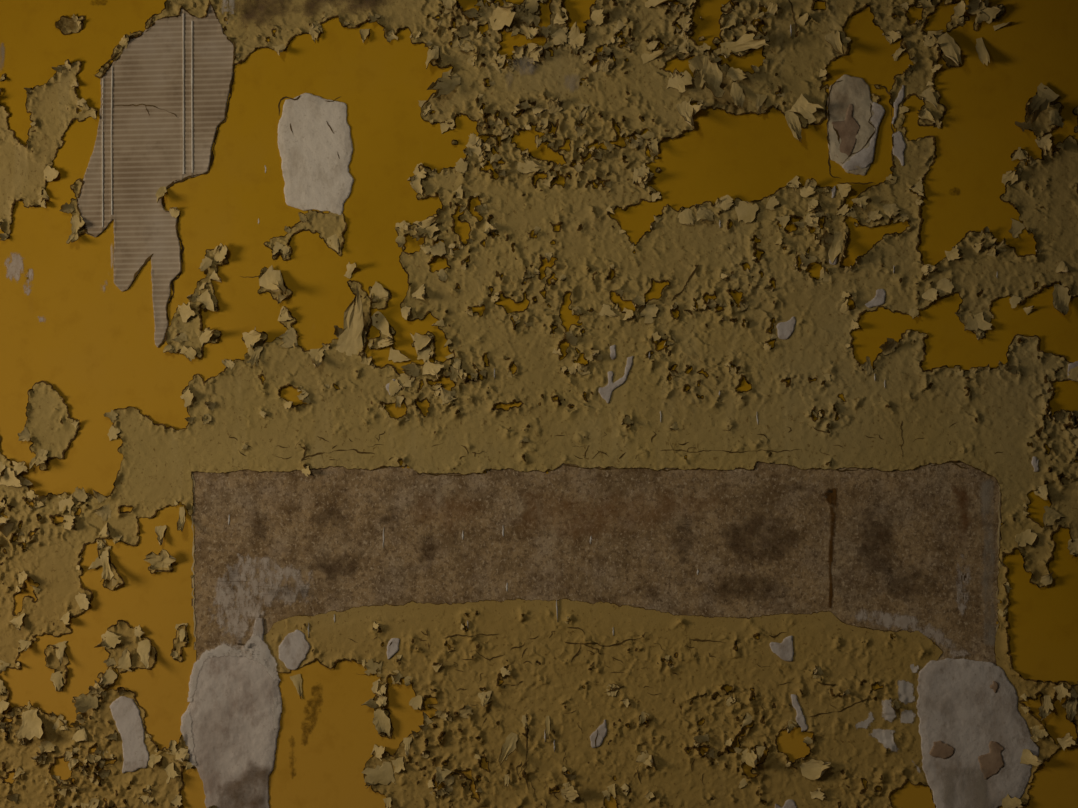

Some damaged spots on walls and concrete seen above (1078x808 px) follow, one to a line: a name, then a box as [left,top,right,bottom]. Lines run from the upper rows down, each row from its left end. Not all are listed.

peeling [0,0,243,347]
peeling [155,6,482,442]
peeling [395,184,517,284]
peeling [416,0,1078,420]
flaking render [0,257,1078,808]
water stain [855,609,968,656]